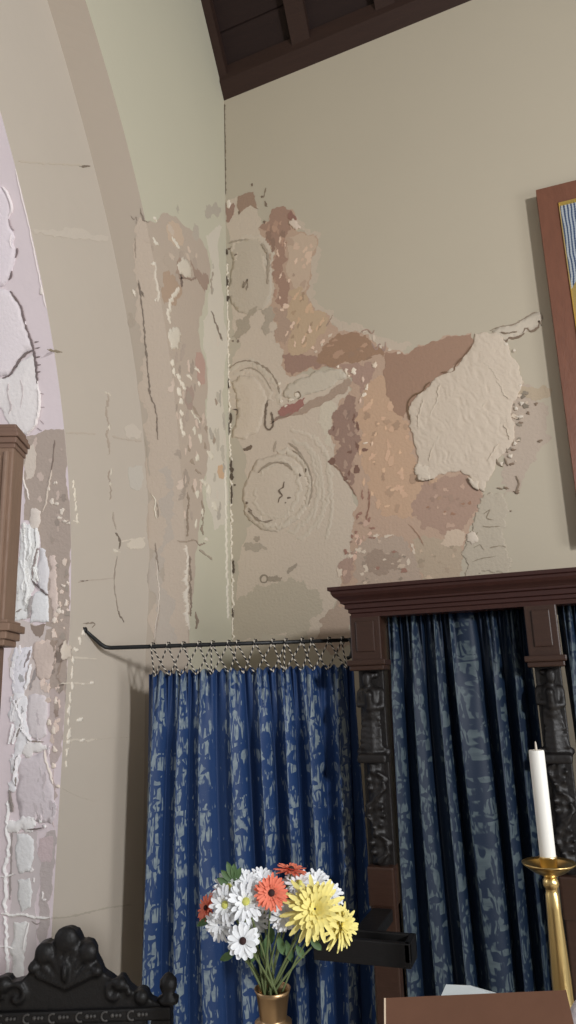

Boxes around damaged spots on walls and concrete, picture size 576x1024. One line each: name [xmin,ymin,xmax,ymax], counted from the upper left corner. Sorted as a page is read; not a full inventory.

crack [221,104,229,195]
crack [3,219,61,471]
flaking render [0,186,71,824]
crack [138,283,158,476]
flaking render [170,183,263,542]
crack [230,360,370,523]
peeling [259,206,522,586]
crack [407,312,542,420]
peeling [10,833,46,977]